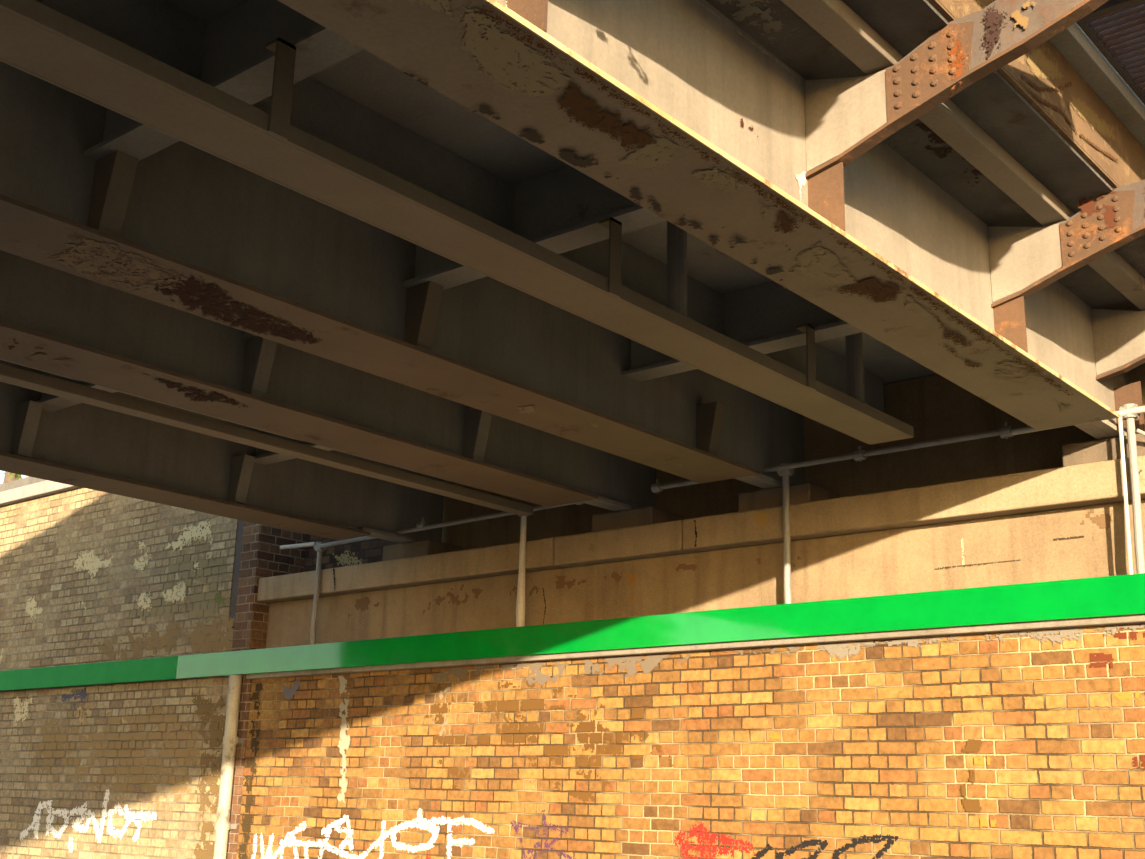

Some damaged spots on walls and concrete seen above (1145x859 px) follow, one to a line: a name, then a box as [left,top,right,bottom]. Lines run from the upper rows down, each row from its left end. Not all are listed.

corrosion [467,2,1074,395]
corrosion [1077,186,1117,233]
corrosion [154,274,323,344]
peeling [73,549,114,579]
peeling [130,541,151,572]
peeling [136,562,201,611]
peeling [163,519,213,551]
damp [337,676,351,803]